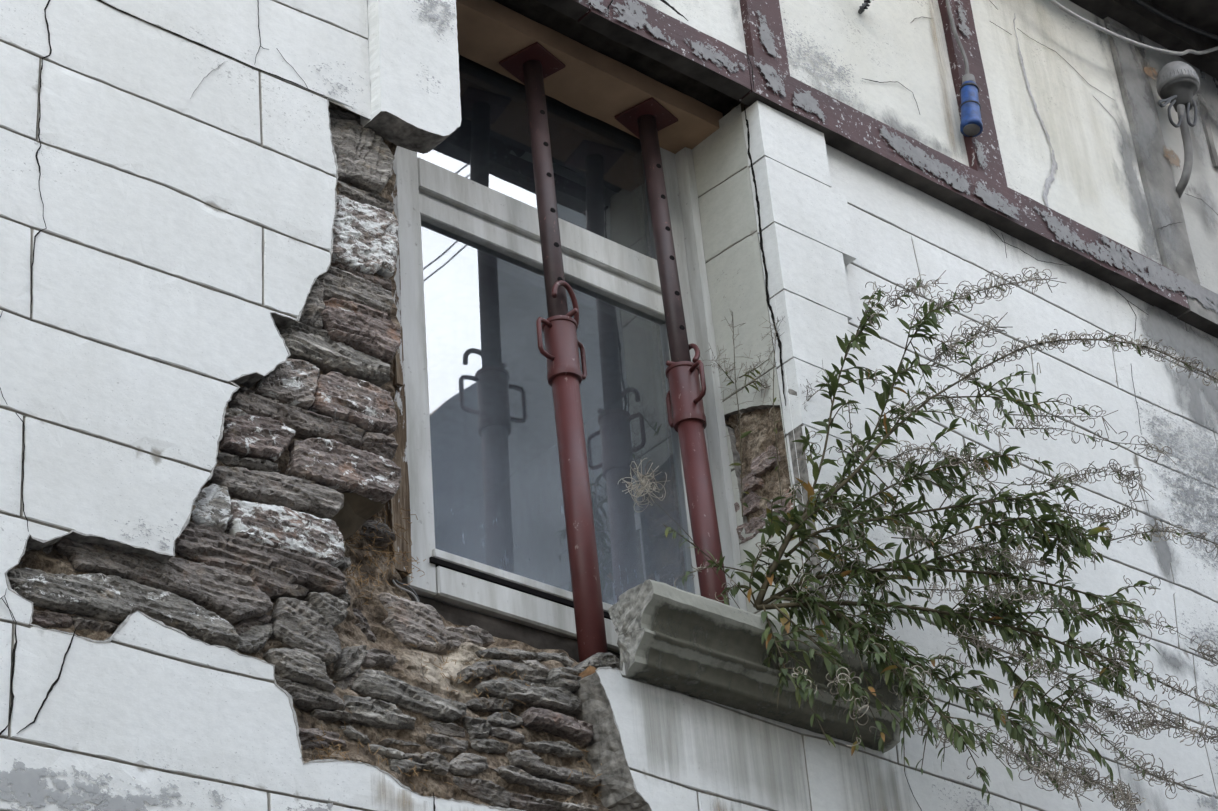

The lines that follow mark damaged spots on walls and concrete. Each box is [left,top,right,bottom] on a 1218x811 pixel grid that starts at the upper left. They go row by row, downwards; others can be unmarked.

crack [99,0,328,98]
peeling [580,0,825,122]
crack [30,0,52,313]
crack [744,50,786,406]
peeling [879,125,1218,315]
crack [0,388,29,532]
flaking render [0,56,652,811]
flaking render [724,404,794,544]
damp [1150,516,1173,575]
damp [1141,305,1218,430]
crack [0,592,77,735]
damp [1162,652,1182,669]